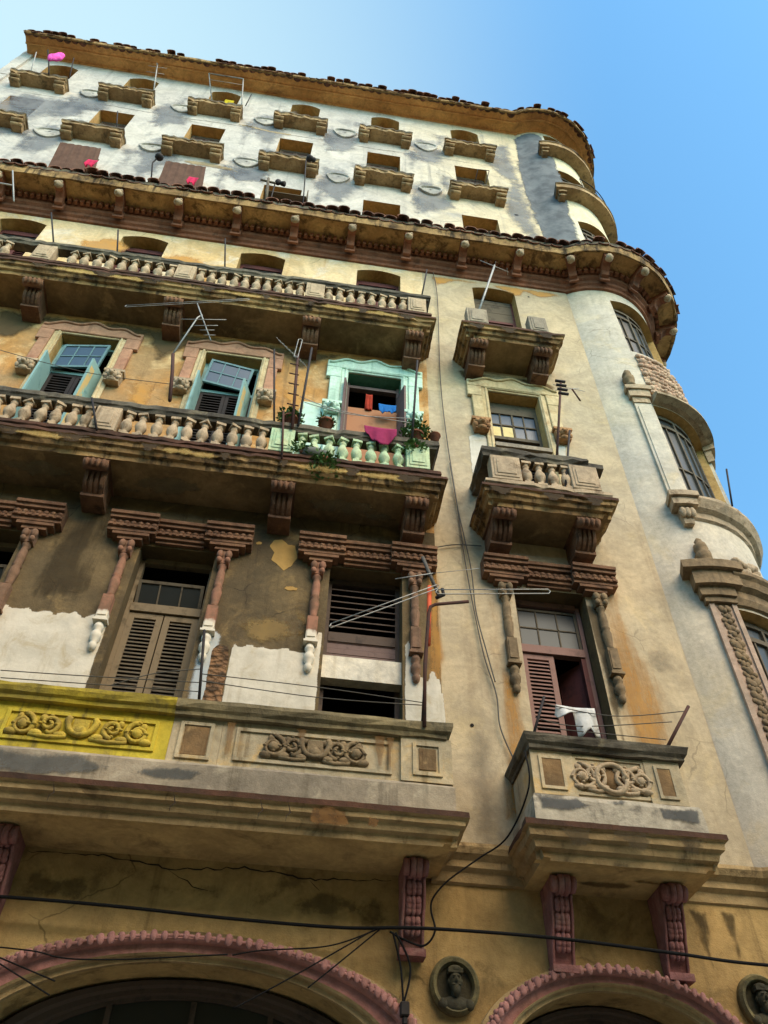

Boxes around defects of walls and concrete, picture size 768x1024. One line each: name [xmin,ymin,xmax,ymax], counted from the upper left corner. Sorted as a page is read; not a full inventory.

damp [490,133,578,242]
peeling [256,540,297,570]
peeling [0,605,106,688]
peeling [189,632,322,710]
peeling [405,641,446,723]
damp [0,750,108,774]
damp [141,768,197,779]
damp [541,795,587,810]
damp [661,808,700,823]
crack [29,851,391,891]